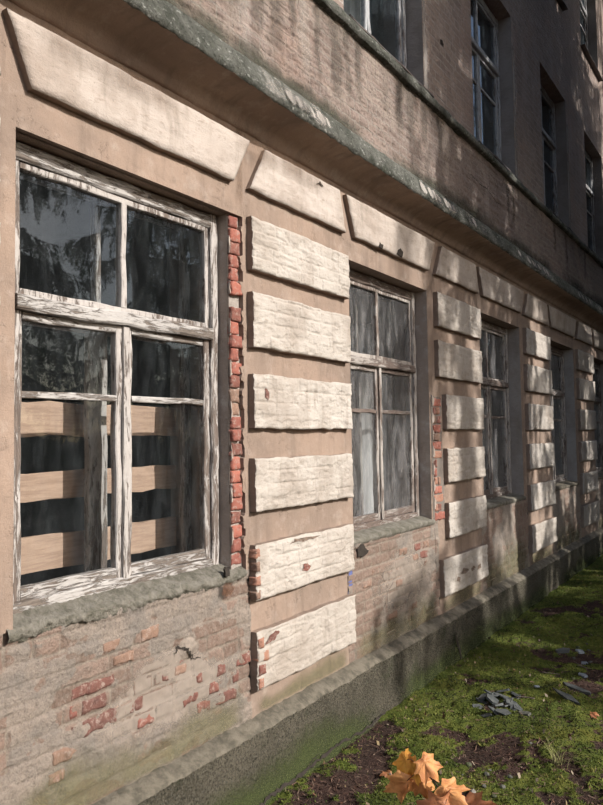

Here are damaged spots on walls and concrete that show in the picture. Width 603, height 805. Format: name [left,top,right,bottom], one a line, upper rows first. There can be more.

water stain [287,90,330,126]
spalling [227,214,261,600]
spalling [69,631,280,745]